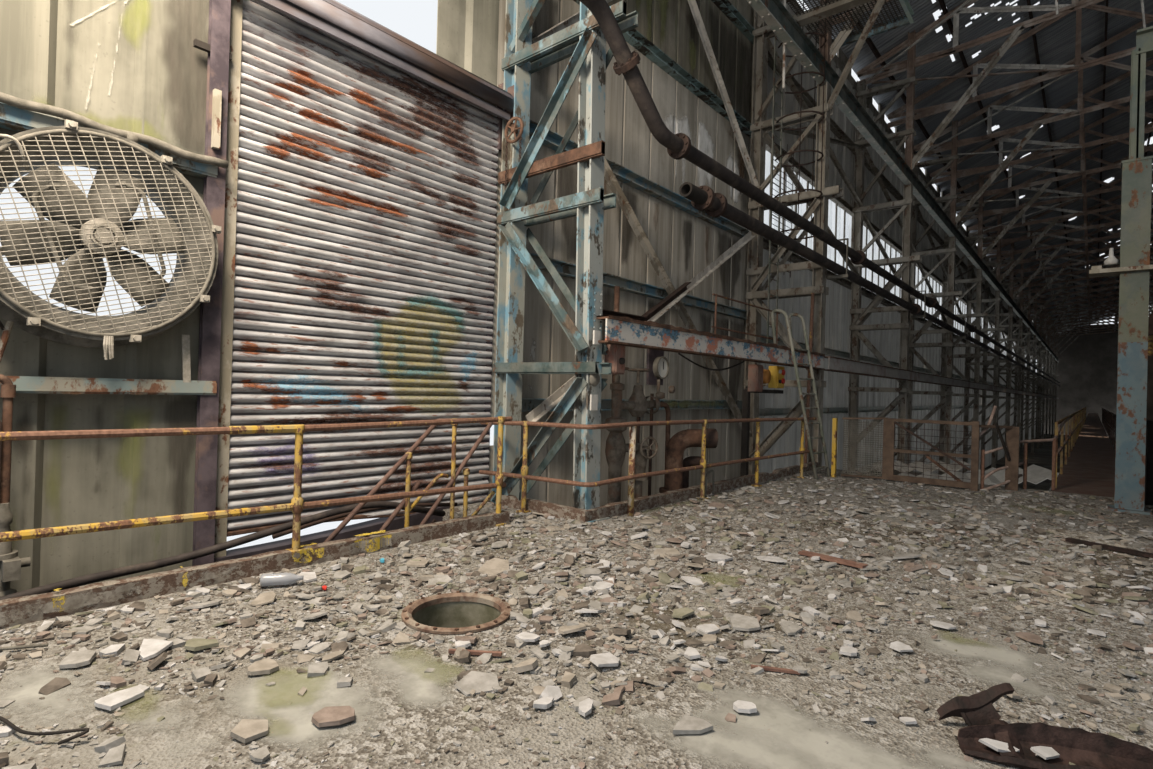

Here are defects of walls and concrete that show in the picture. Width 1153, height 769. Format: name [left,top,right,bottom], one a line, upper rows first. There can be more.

corrosion [264,30,482,256]
corrosion [450,297,481,316]